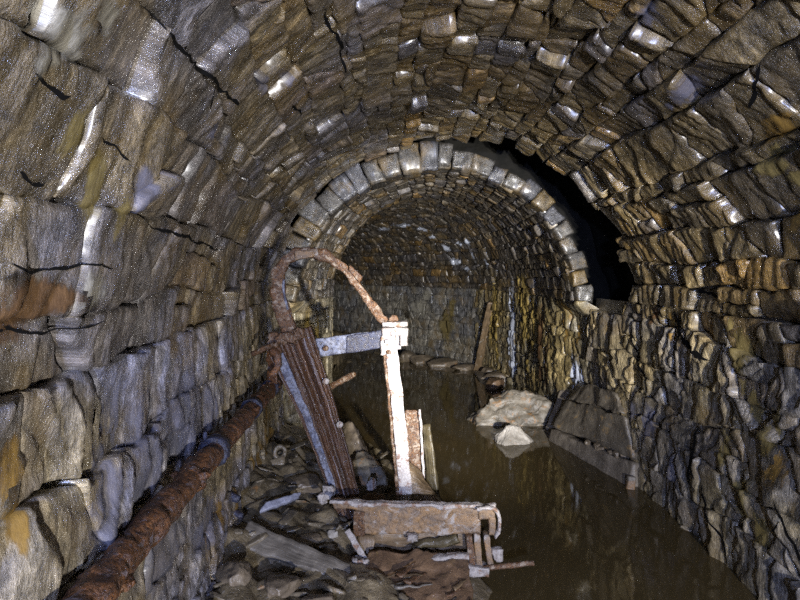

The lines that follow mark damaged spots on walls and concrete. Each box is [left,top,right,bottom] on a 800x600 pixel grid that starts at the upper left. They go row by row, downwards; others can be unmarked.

crack [140,4,239,109]
crack [35,73,70,101]
crack [20,171,46,187]
crack [9,263,112,275]
corrosion [0,277,79,343]